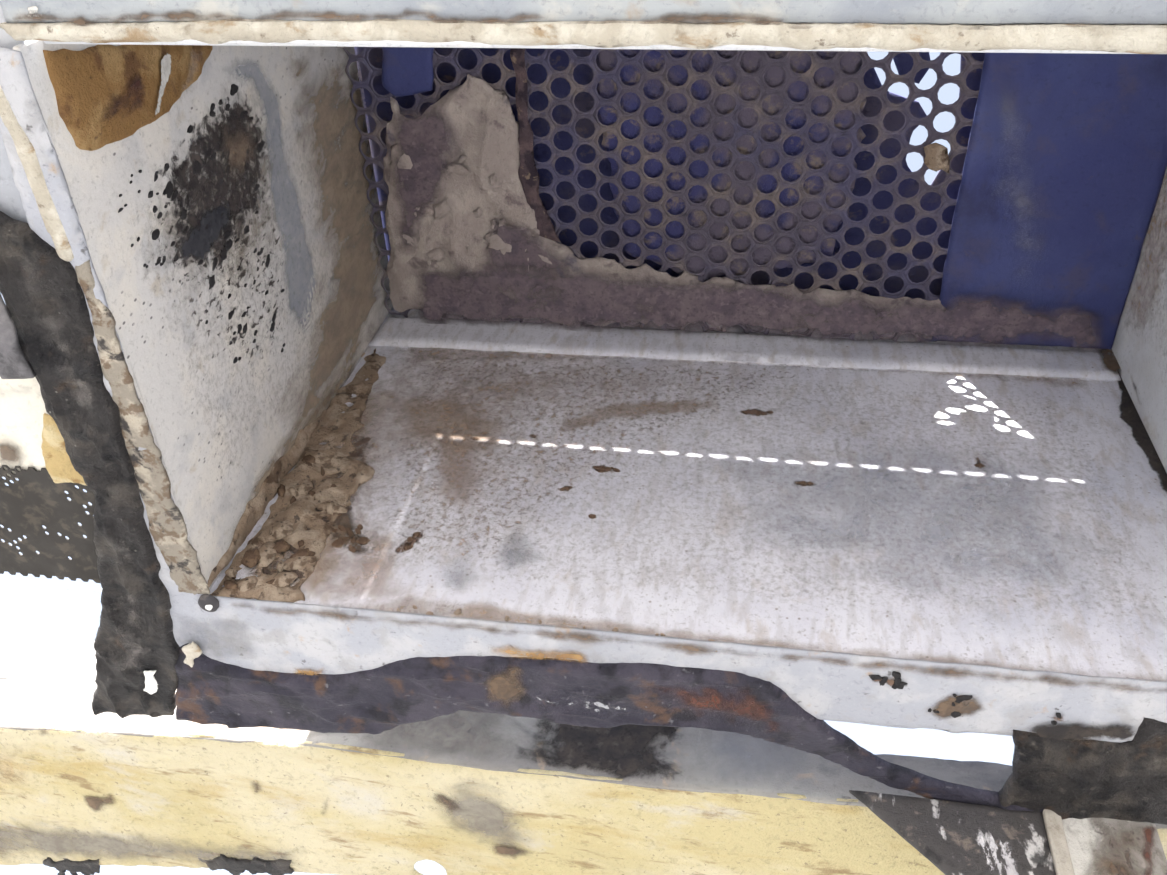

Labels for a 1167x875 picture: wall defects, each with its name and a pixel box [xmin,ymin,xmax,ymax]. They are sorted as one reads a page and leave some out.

damp [118,65,316,363]
corrosion [207,65,386,614]
corrosion [394,349,800,555]
corrosion [319,608,365,620]
corrosion [387,604,601,702]
corrosion [612,627,731,653]
corrosion [863,660,1016,679]
corrosion [1039,676,1075,685]
corrosion [659,686,777,730]